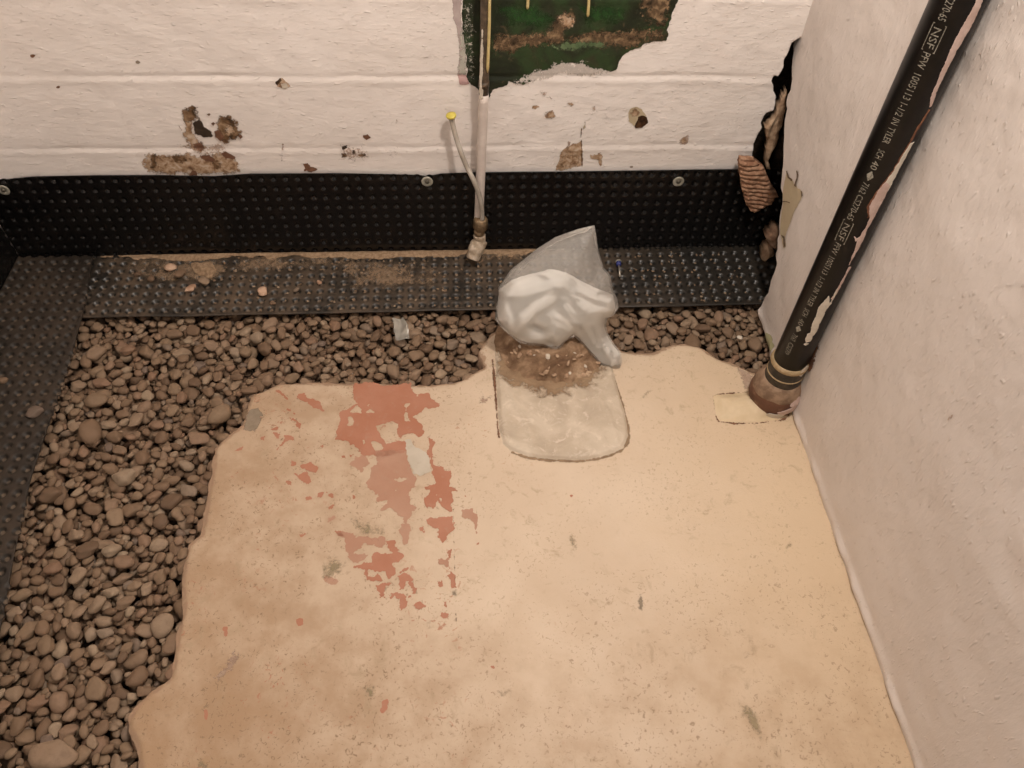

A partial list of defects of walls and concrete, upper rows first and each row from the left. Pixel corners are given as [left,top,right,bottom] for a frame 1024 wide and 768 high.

peeling [453,0,678,99]
peeling [556,128,603,171]
spalling [628,107,648,128]
peeling [780,171,802,248]
peeling [260,390,324,450]
peeling [286,382,479,610]